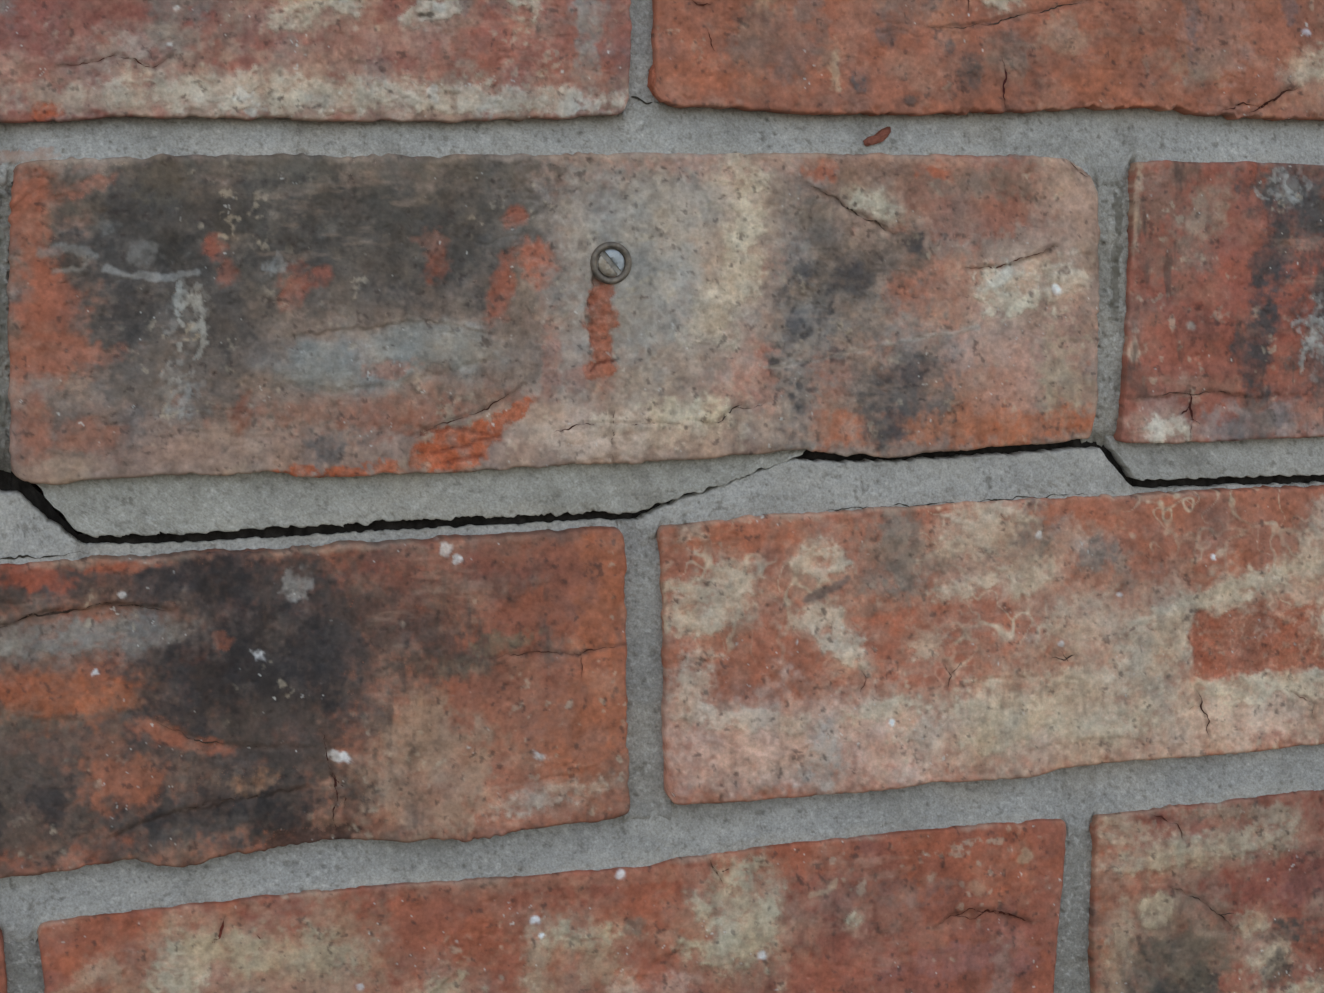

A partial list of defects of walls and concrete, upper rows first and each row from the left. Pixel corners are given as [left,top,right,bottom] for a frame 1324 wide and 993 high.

crack [0,470,712,560]
crack [794,439,1324,511]